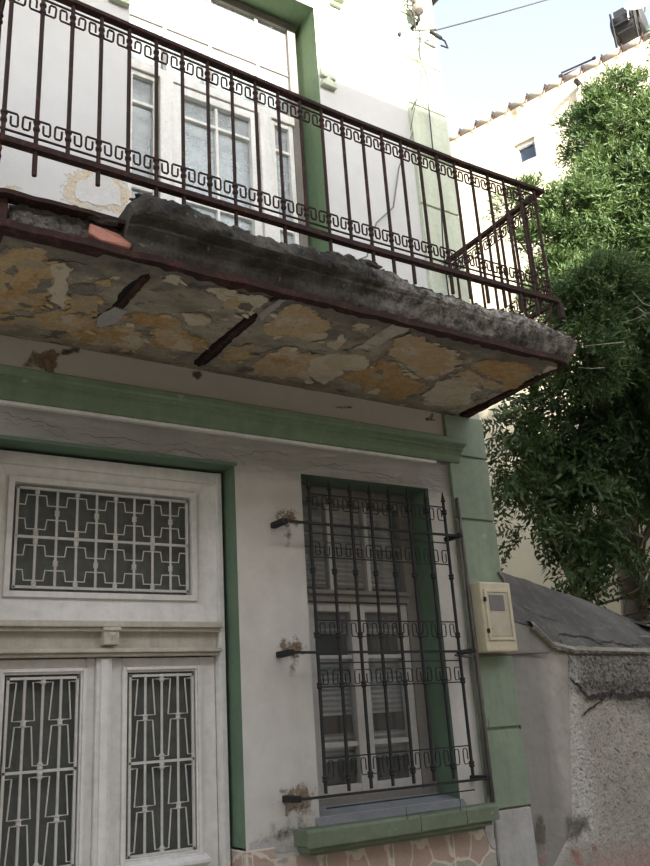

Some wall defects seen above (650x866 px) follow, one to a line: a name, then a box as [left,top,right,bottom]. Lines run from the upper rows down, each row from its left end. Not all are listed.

peeling [60,169,131,214]
flaking render [87,224,131,257]
peeling [0,247,557,408]
corrosion [25,348,79,372]
corrosion [280,638,302,668]